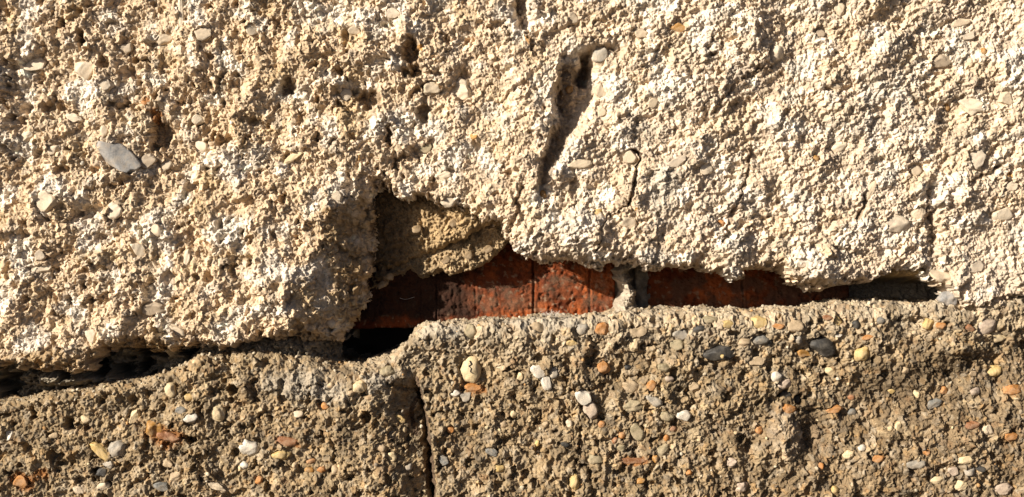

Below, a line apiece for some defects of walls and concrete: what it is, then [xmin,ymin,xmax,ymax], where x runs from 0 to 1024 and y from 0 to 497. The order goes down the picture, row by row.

spalling [368,188,509,290]
crack [409,376,436,497]